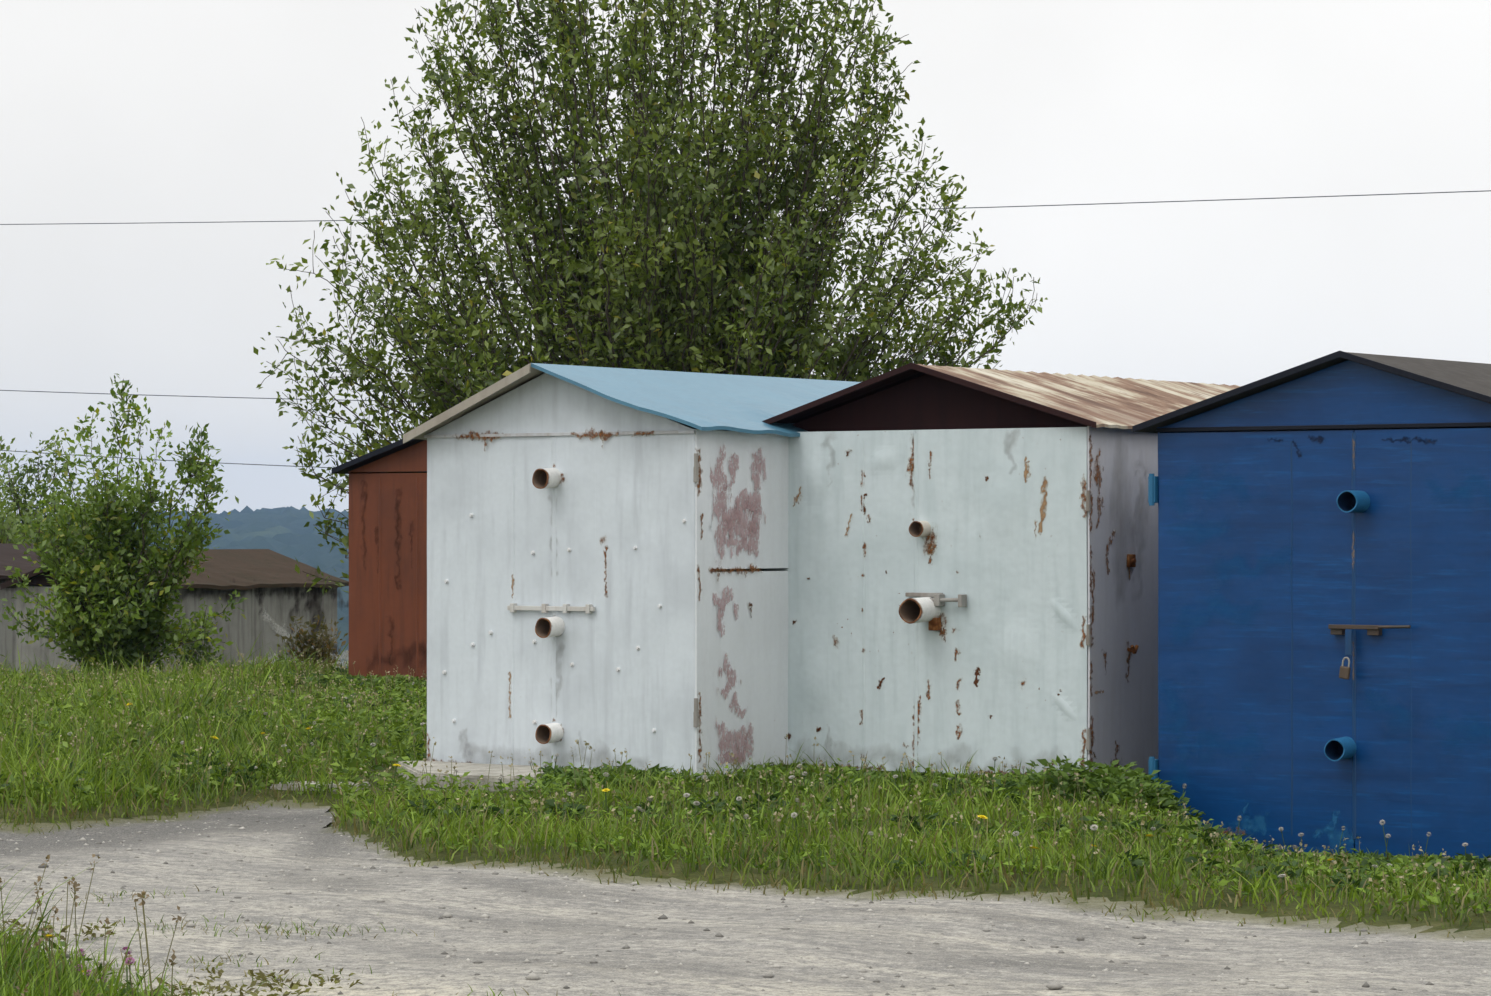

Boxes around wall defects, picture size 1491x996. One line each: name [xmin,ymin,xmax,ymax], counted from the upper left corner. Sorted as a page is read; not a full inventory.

rust [456,431,503,451]
rust [571,428,654,446]
peeling [710,447,766,559]
rust [923,532,937,564]
rust [1080,435,1107,697]
peeling [713,586,754,767]
rust [1080,716,1119,772]